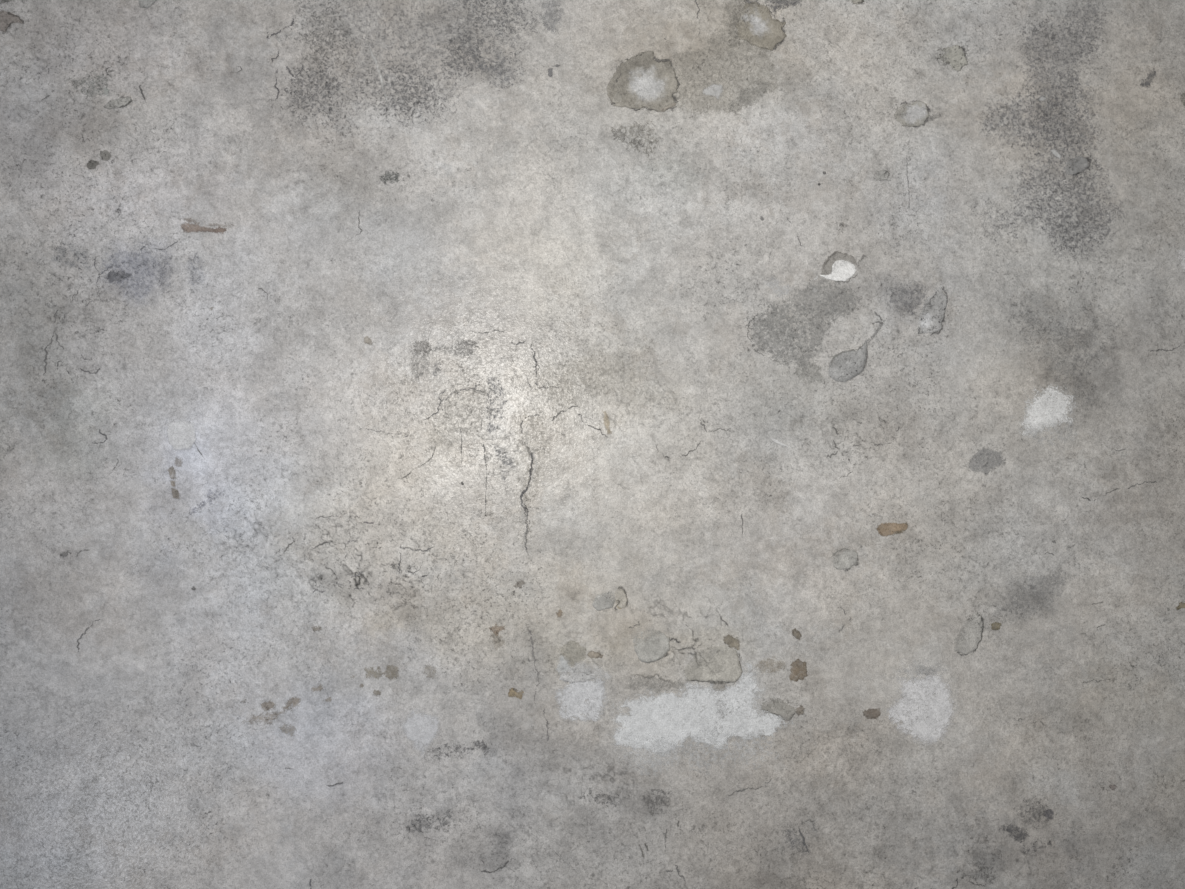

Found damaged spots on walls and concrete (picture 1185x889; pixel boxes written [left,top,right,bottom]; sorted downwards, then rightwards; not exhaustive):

spalling [607,51,680,112]
spalling [736,0,787,50]
damp [985,4,1120,254]
damp [747,279,862,369]
crack [361,379,487,517]
crack [468,322,607,555]